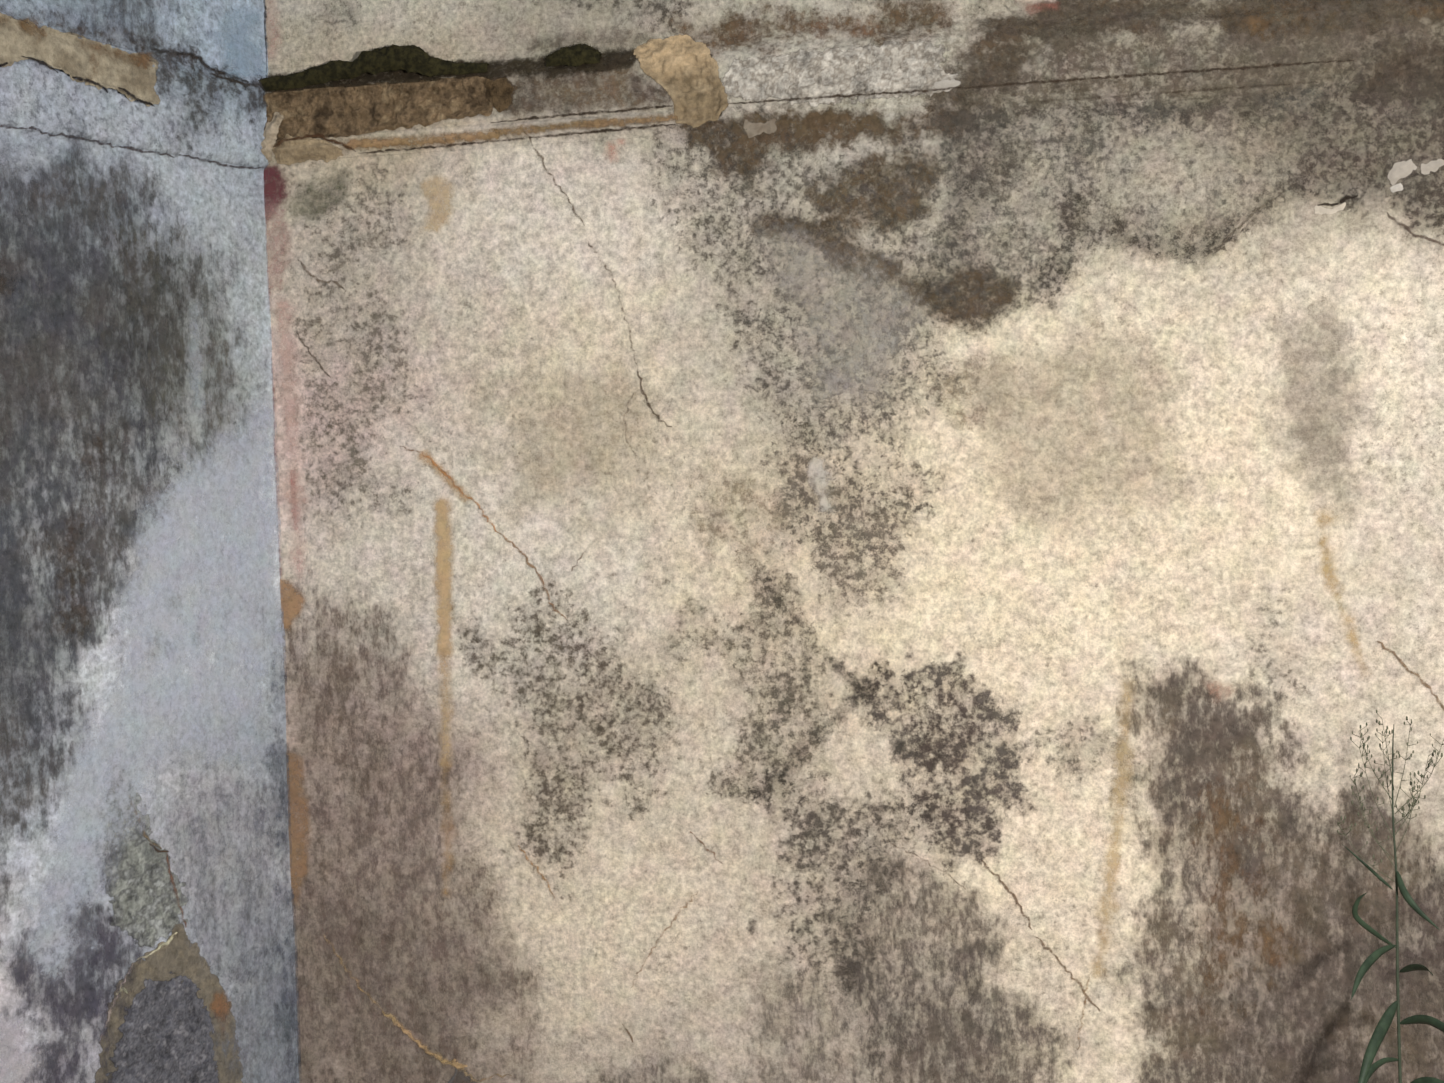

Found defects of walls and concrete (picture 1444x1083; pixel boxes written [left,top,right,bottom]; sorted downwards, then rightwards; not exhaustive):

spalling [0,12,160,107]
damp [49,0,691,519]
spalling [261,76,518,165]
crack [367,105,675,427]
damp [0,134,532,1083]
corrosion [420,452,466,766]
crack [400,446,582,620]
damp [458,583,670,877]
damp [650,0,1444,1083]
spalling [95,767,243,1083]
damp [600,1060,708,1083]